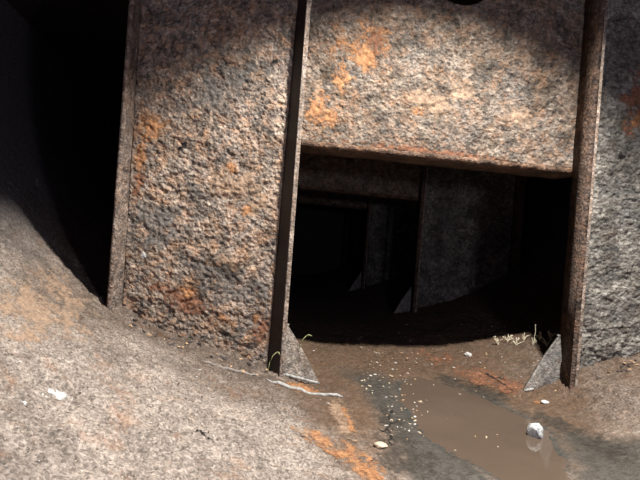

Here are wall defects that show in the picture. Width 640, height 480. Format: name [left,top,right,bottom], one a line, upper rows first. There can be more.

corrosion [330,13,391,94]
corrosion [305,80,341,128]
corrosion [133,113,172,195]
corrosion [147,280,230,325]